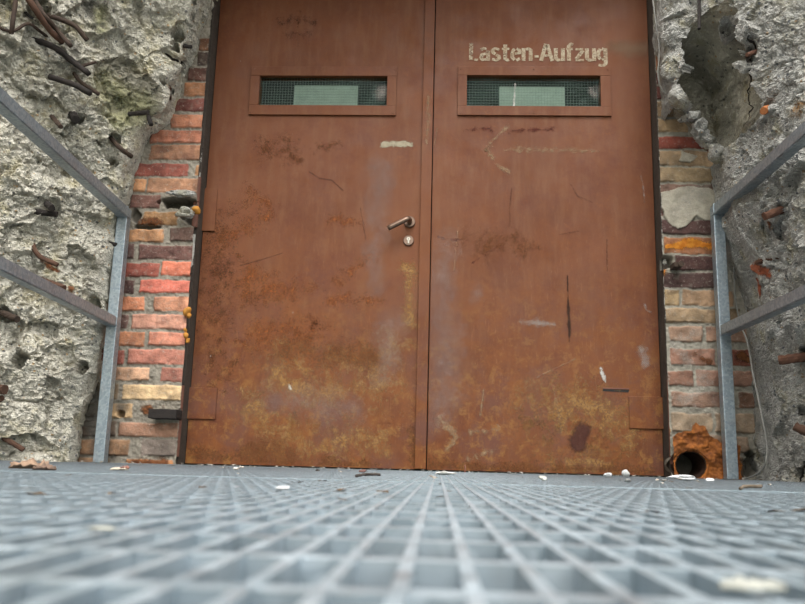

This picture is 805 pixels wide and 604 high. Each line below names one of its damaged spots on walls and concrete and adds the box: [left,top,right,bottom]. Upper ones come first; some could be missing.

spalling [718,15,738,45]
spalling [741,43,759,63]
corrosion [665,238,712,250]